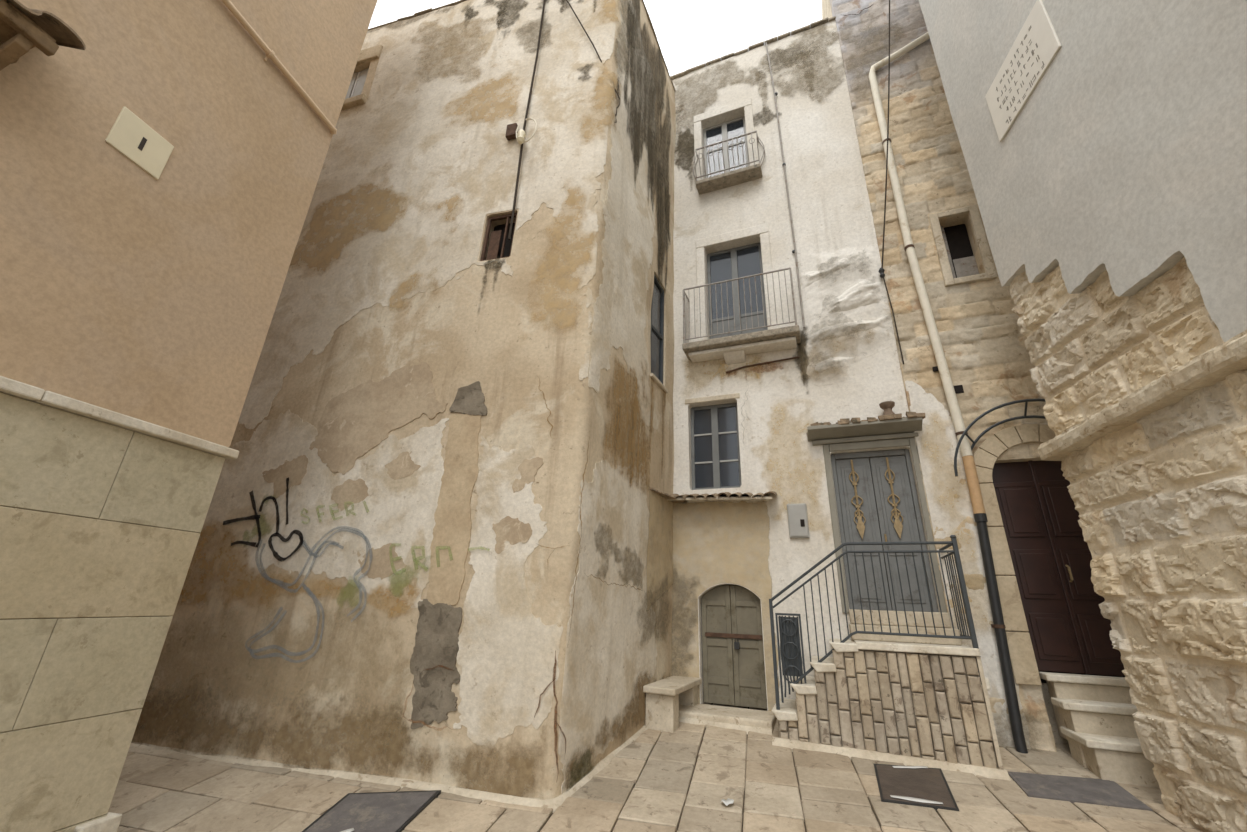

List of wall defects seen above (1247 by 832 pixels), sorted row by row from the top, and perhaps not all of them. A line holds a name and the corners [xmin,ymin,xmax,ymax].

damp [584,0,901,291]
flaking render [178,0,658,608]
damp [604,360,666,490]
damp [794,327,873,393]
damp [131,525,433,776]
damp [450,747,541,797]
crack [534,437,641,783]
damp [567,527,696,782]